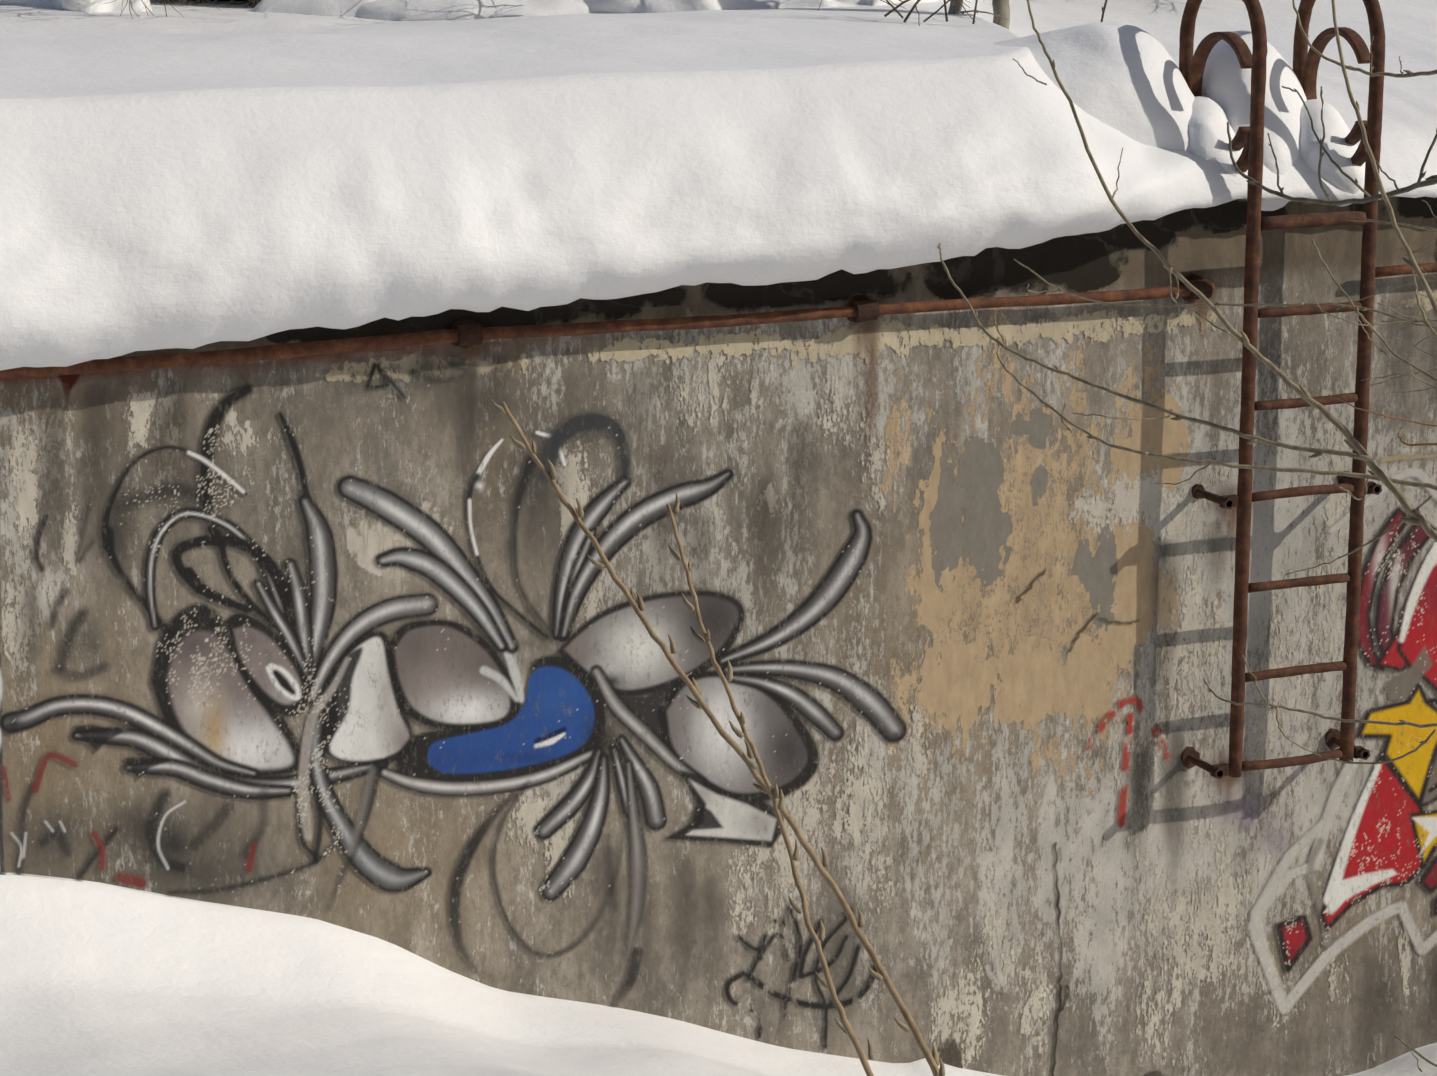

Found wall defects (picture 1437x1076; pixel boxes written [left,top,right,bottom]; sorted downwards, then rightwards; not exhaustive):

crack [1016,570,1046,603]
crack [1069,612,1139,652]
peeling [667,307,1308,1076]
peeling [1322,930,1351,1007]
peeling [1397,921,1412,1008]